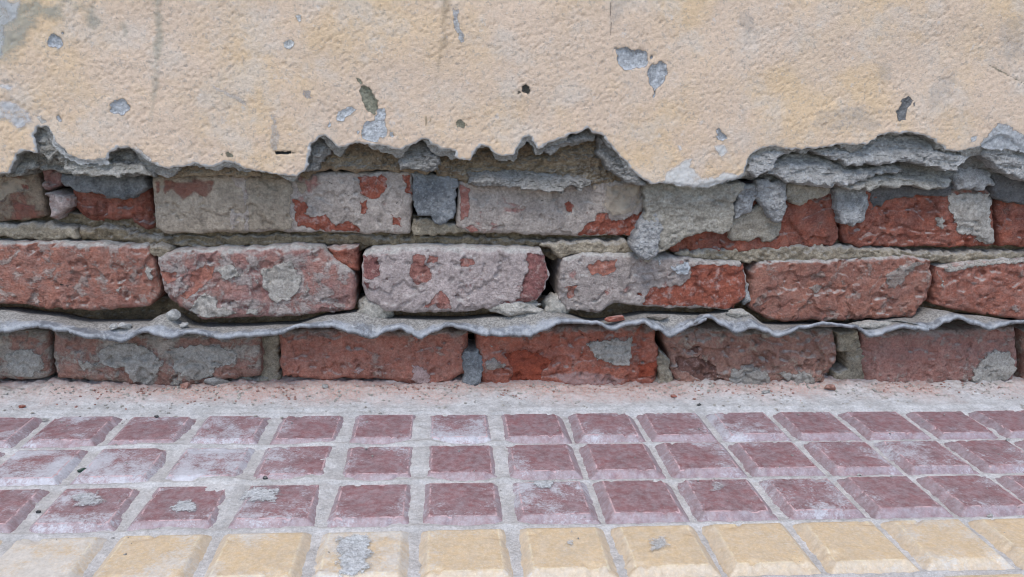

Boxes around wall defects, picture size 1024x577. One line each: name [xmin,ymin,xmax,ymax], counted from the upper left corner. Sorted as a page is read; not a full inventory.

peeling [615,47,668,98]
peeling [0,102,117,166]
peeling [110,99,130,116]
spalling [132,147,300,181]
peeling [311,78,410,158]
spalling [421,135,569,162]
peeling [665,146,799,187]
spalling [817,144,864,153]
peeling [880,96,915,137]
peeling [925,123,1024,157]
spalling [292,174,387,232]
spalling [578,212,642,236]